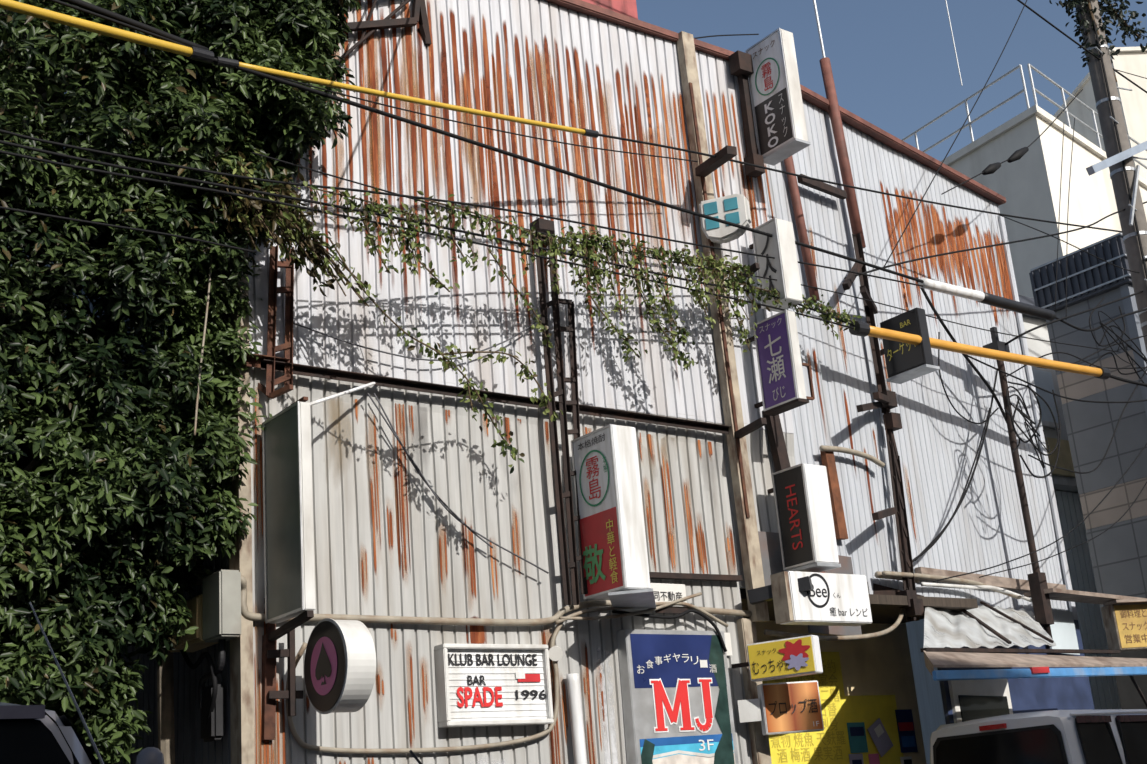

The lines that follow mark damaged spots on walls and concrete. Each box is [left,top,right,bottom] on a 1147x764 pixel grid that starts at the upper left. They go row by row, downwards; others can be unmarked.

corrosion [296,0,703,350]
corrosion [880,182,1015,325]
corrosion [362,403,414,592]
corrosion [439,533,447,581]
corrosion [462,520,476,597]
corrosion [490,542,498,598]
corrosion [512,517,520,573]
corrosion [639,433,708,574]
corrosion [466,617,486,644]
corrosion [408,656,428,746]
corrosion [548,660,568,764]
corrosion [584,645,604,764]